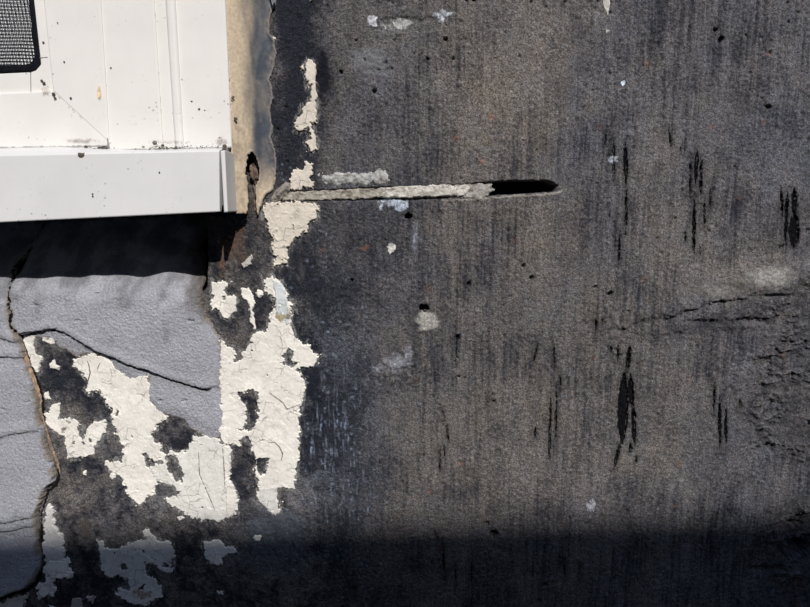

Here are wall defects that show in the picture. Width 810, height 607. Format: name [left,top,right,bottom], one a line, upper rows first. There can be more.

peeling [289,57,321,190]
peeling [23,335,60,375]
peeling [44,200,322,526]
crack [0,221,218,600]
crack [198,446,225,510]
peeling [96,527,177,607]
peeling [200,537,241,566]